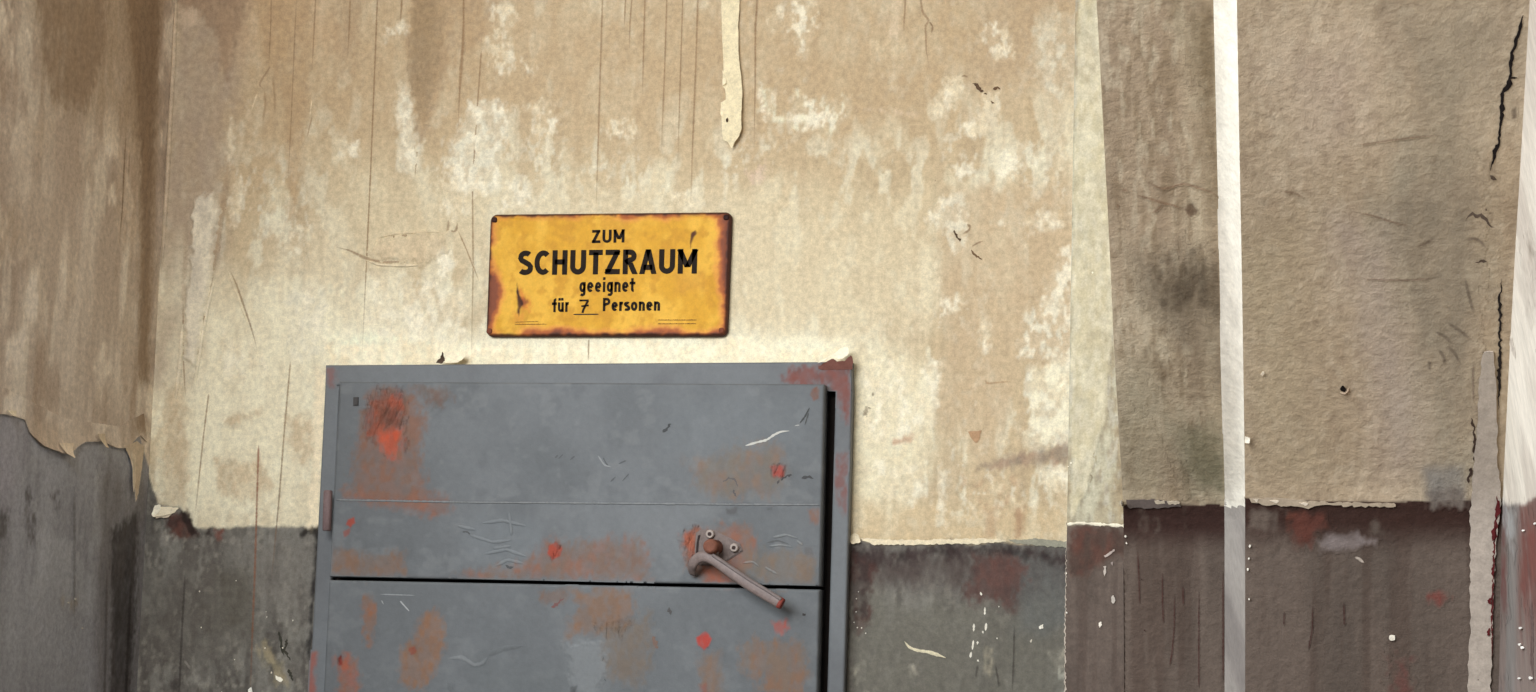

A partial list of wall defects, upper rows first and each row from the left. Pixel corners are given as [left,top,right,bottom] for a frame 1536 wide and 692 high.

peeling [0,388,178,518]
damp [30,0,378,692]
peeling [303,0,1191,692]
crack [1490,16,1523,180]